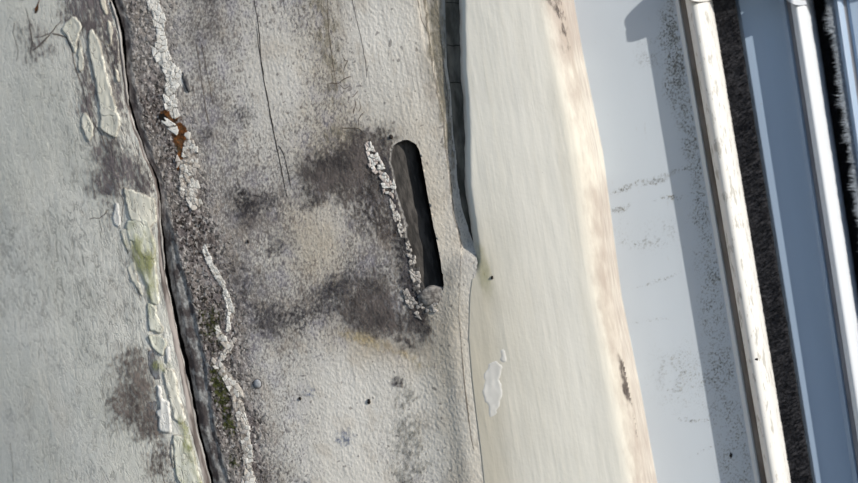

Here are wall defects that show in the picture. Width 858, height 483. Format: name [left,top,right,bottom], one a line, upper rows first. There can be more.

damp [60,0,129,122]
damp [87,135,156,204]
peeling [61,0,210,483]
crack [111,0,213,483]
rust [159,110,187,170]
damp [234,189,278,227]
crack [254,0,291,196]
damp [254,127,431,348]
damp [664,10,701,182]
damp [110,347,171,482]
peeling [482,349,507,417]